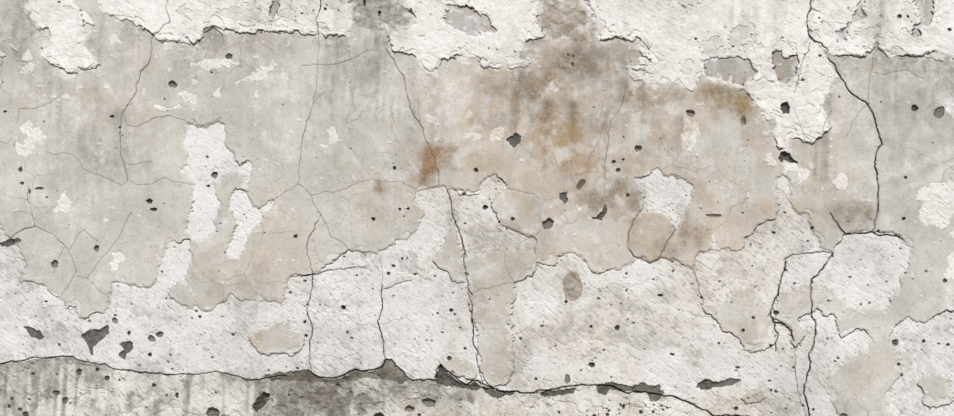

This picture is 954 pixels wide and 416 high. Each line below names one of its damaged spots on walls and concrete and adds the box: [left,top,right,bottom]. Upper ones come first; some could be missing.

peeling [0,0,98,74]
crack [47,0,221,185]
crack [0,356,286,381]
spalling [180,122,252,239]
corrosion [421,147,443,180]
spalling [0,151,911,416]
crack [270,0,740,416]
peeling [97,0,954,154]
corrosion [707,86,751,112]
crack [769,251,833,416]
crack [794,0,922,242]
spalling [886,310,954,416]